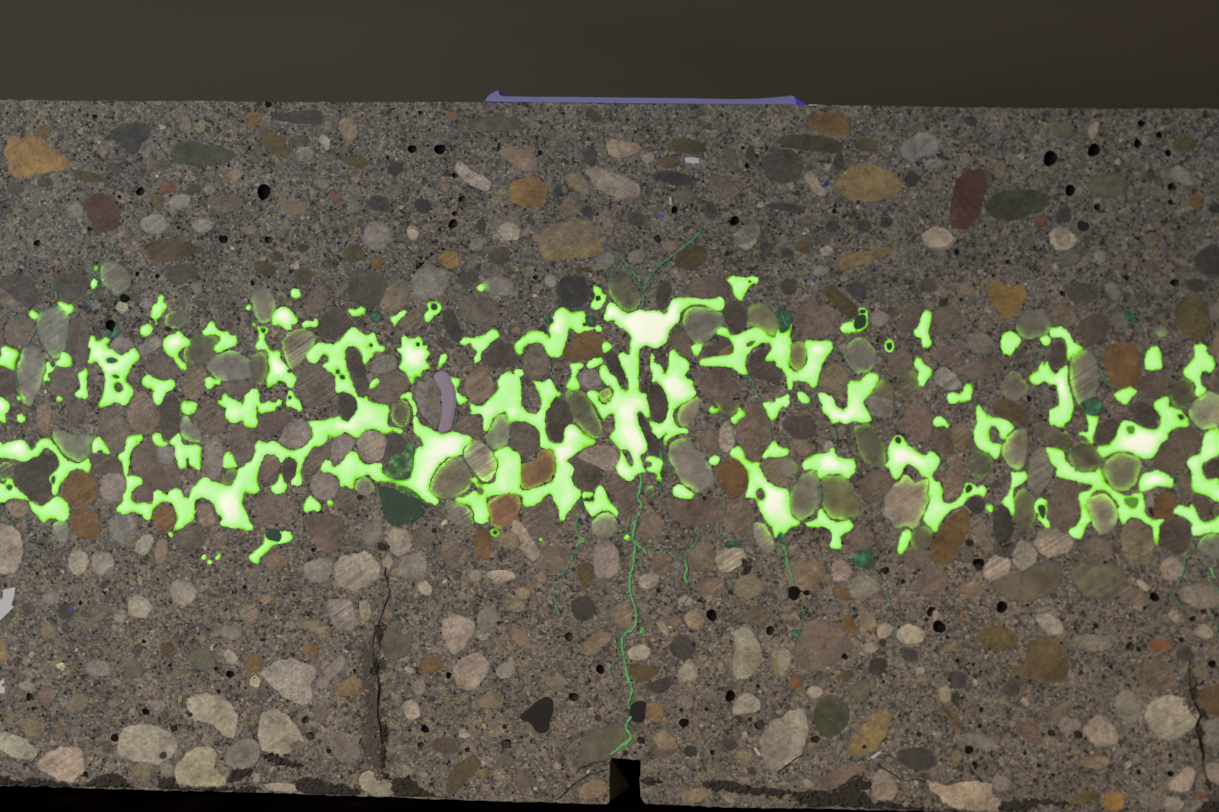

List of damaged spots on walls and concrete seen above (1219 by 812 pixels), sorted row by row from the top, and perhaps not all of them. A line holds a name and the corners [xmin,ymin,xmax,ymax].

crack [606,228,703,310]
crack [372,568,390,745]
crack [557,443,726,799]
crack [1188,665,1219,788]